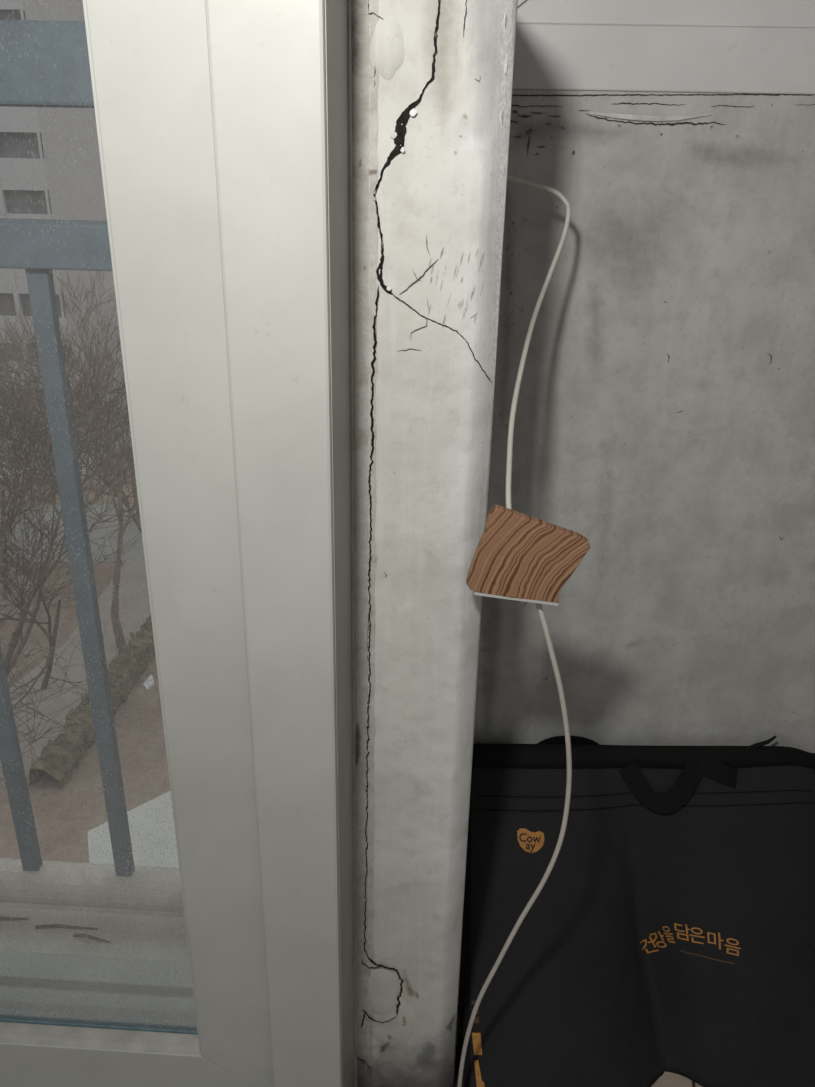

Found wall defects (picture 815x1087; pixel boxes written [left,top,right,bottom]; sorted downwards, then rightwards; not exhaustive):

crack [361,0,492,1028]